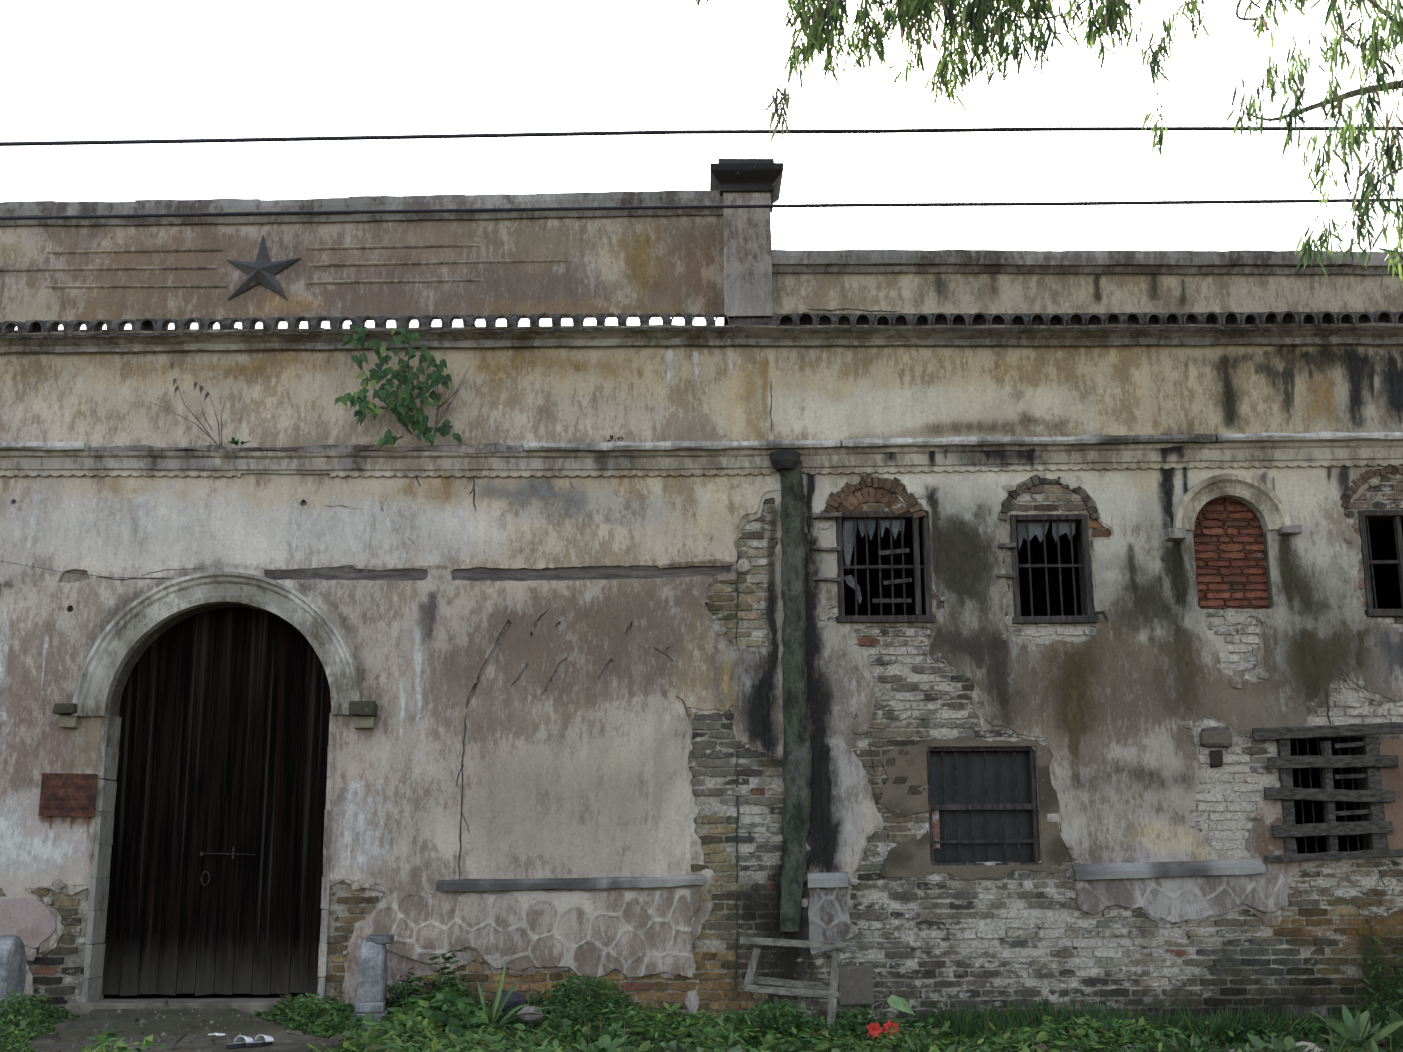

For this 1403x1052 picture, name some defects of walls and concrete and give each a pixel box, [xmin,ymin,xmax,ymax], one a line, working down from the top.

damp [1216,346,1403,427]
spalling [705,490,783,652]
spalling [818,474,925,544]
damp [926,488,994,611]
damp [1127,434,1198,706]
crack [455,711,469,879]
damp [740,474,841,1003]
spalling [418,533,1403,1038]
damp [933,625,1018,724]
damp [1050,650,1095,781]
spalling [25,879,90,1014]
spalling [319,878,391,1003]